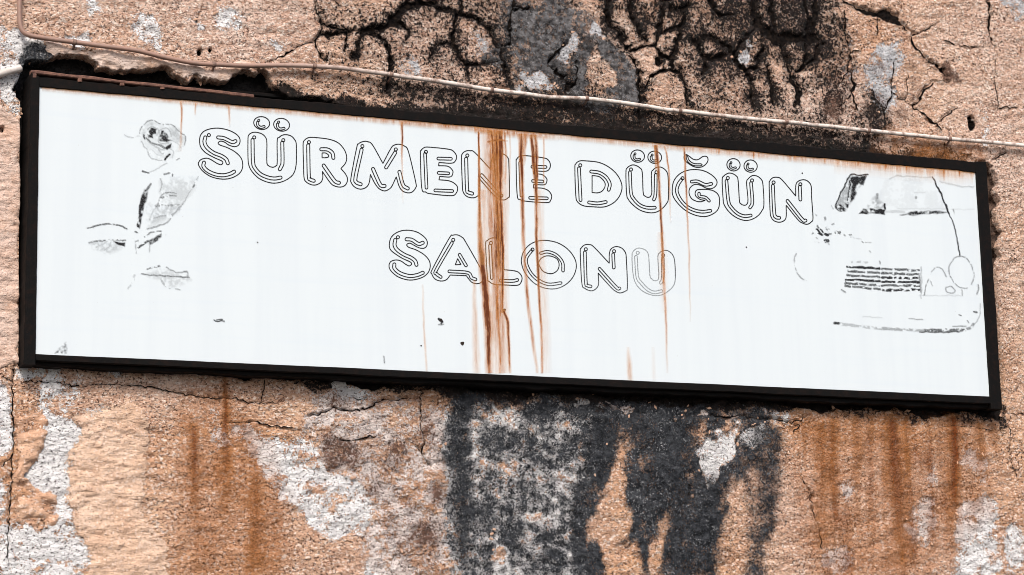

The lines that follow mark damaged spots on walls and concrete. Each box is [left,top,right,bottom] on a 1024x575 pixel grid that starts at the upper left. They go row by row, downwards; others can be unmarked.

spalling [0,20,272,171]
crack [269,0,530,91]
crack [547,42,579,91]
damp [264,0,976,162]
crack [605,0,1016,155]
peeling [0,363,104,575]
crack [2,368,429,567]
rust [222,379,249,470]
peeling [208,381,664,575]
damp [280,379,1008,575]
rust [820,414,985,574]